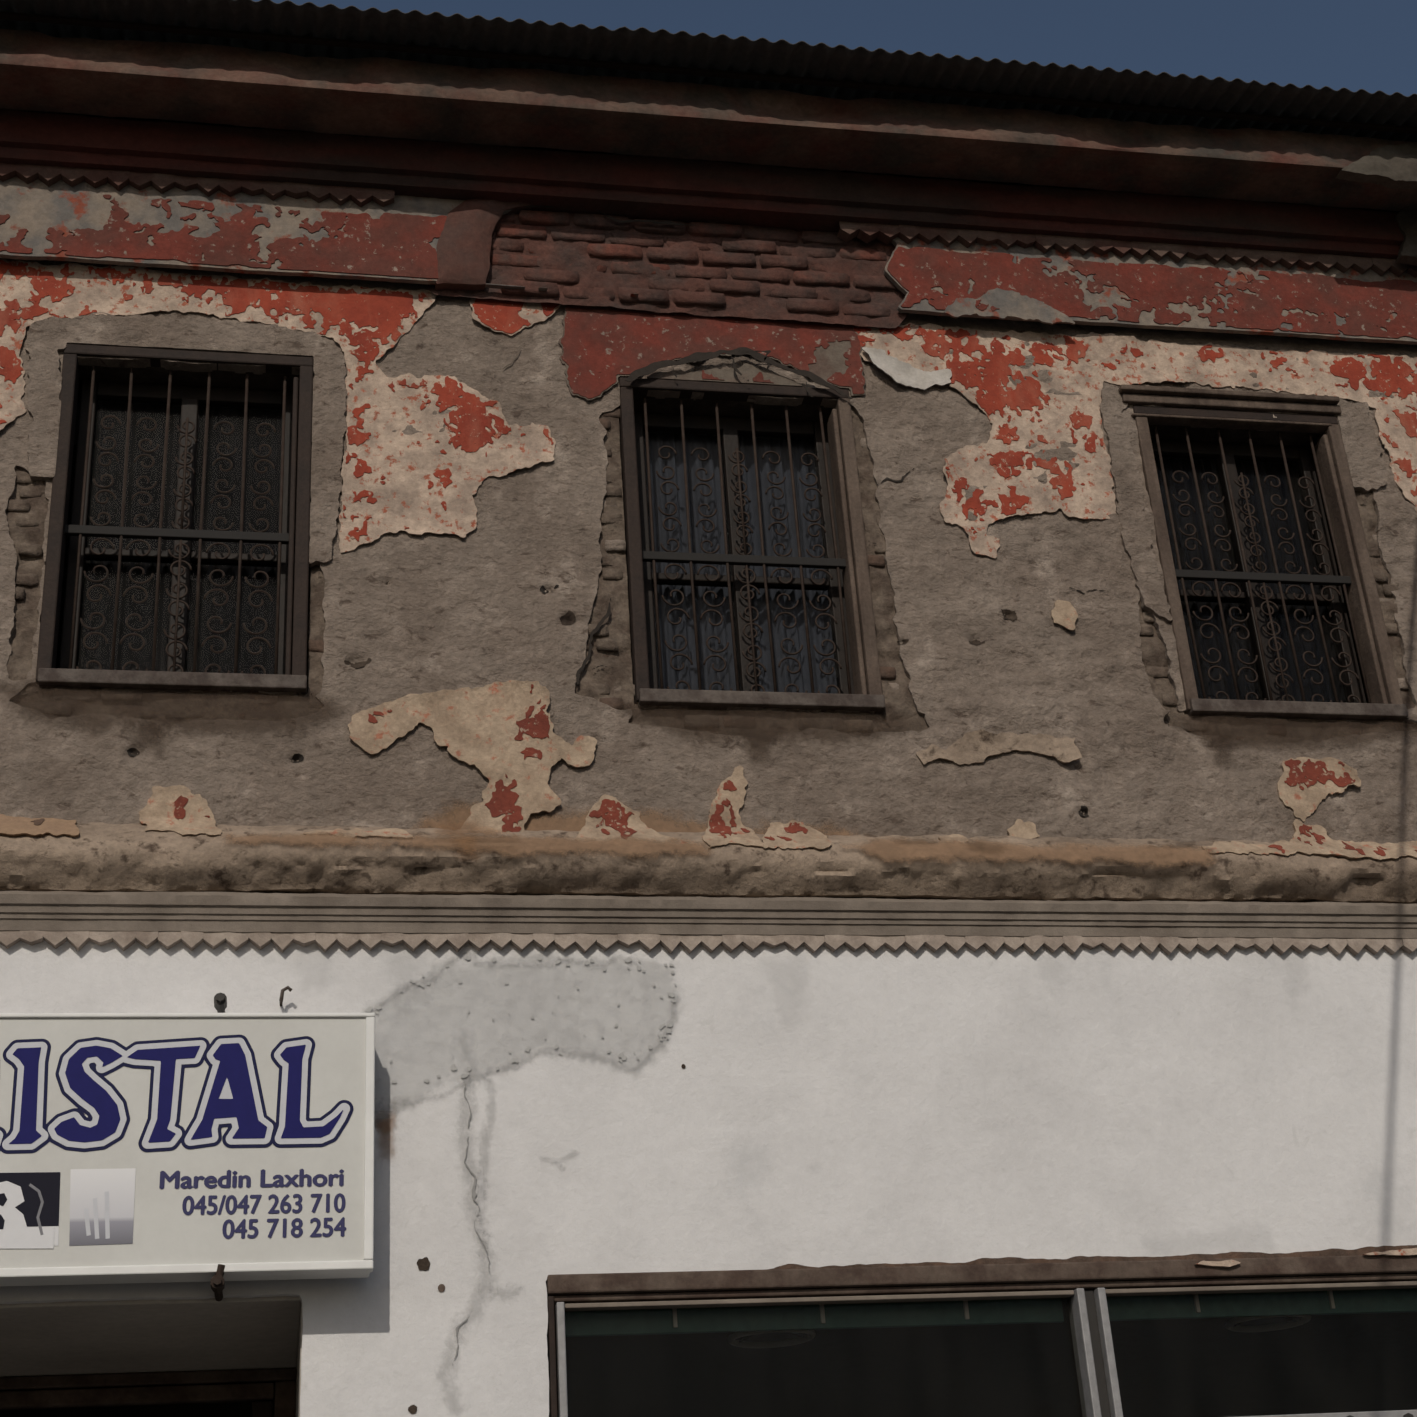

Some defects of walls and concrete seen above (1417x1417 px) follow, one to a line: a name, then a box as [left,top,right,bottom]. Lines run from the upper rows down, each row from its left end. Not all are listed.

spalling [1336,143,1417,190]
peeling [0,194,1417,766]
spalling [1138,491,1417,861]
peeling [347,680,597,832]
peeling [575,765,832,850]
crack [463,1078,490,1272]
crack [452,1315,469,1368]